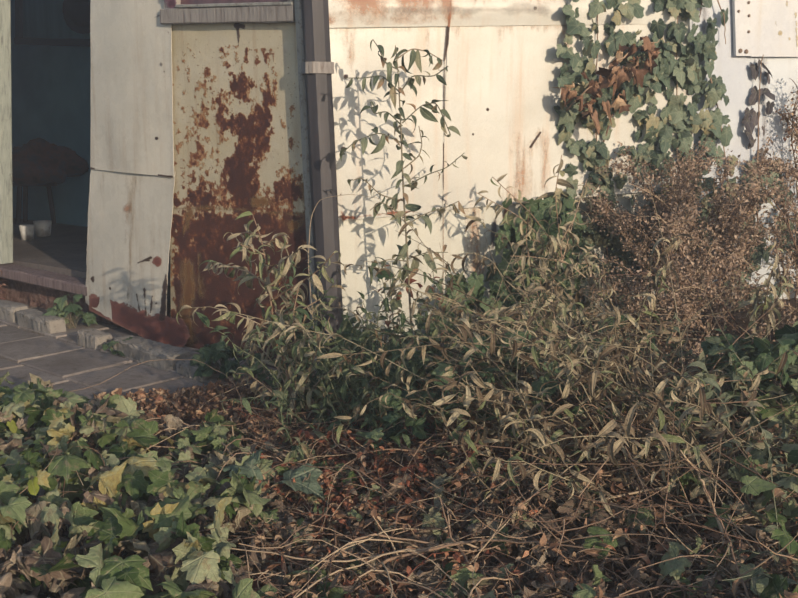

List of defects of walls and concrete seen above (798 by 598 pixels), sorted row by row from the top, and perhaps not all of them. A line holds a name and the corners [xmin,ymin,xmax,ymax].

corrosion [347,0,383,14]
corrosion [401,0,452,13]
corrosion [152,23,311,375]